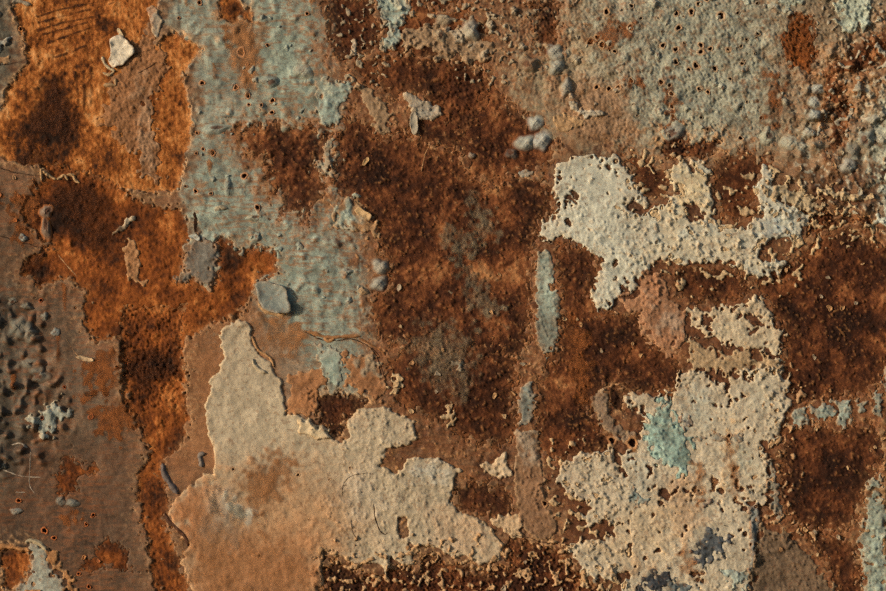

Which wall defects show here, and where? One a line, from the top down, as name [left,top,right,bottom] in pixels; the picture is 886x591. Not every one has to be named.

spalling [233,83,276,115]
peeling [313,0,515,181]
peeling [553,101,604,132]
corrosion [757,12,886,160]
peeling [778,0,886,140]
corrosion [0,0,281,591]
corrosion [231,0,694,462]
corrosion [675,207,886,406]
peeling [16,526,91,591]
corrosion [318,537,606,591]
corrosion [453,476,516,518]
corrosion [777,417,886,591]